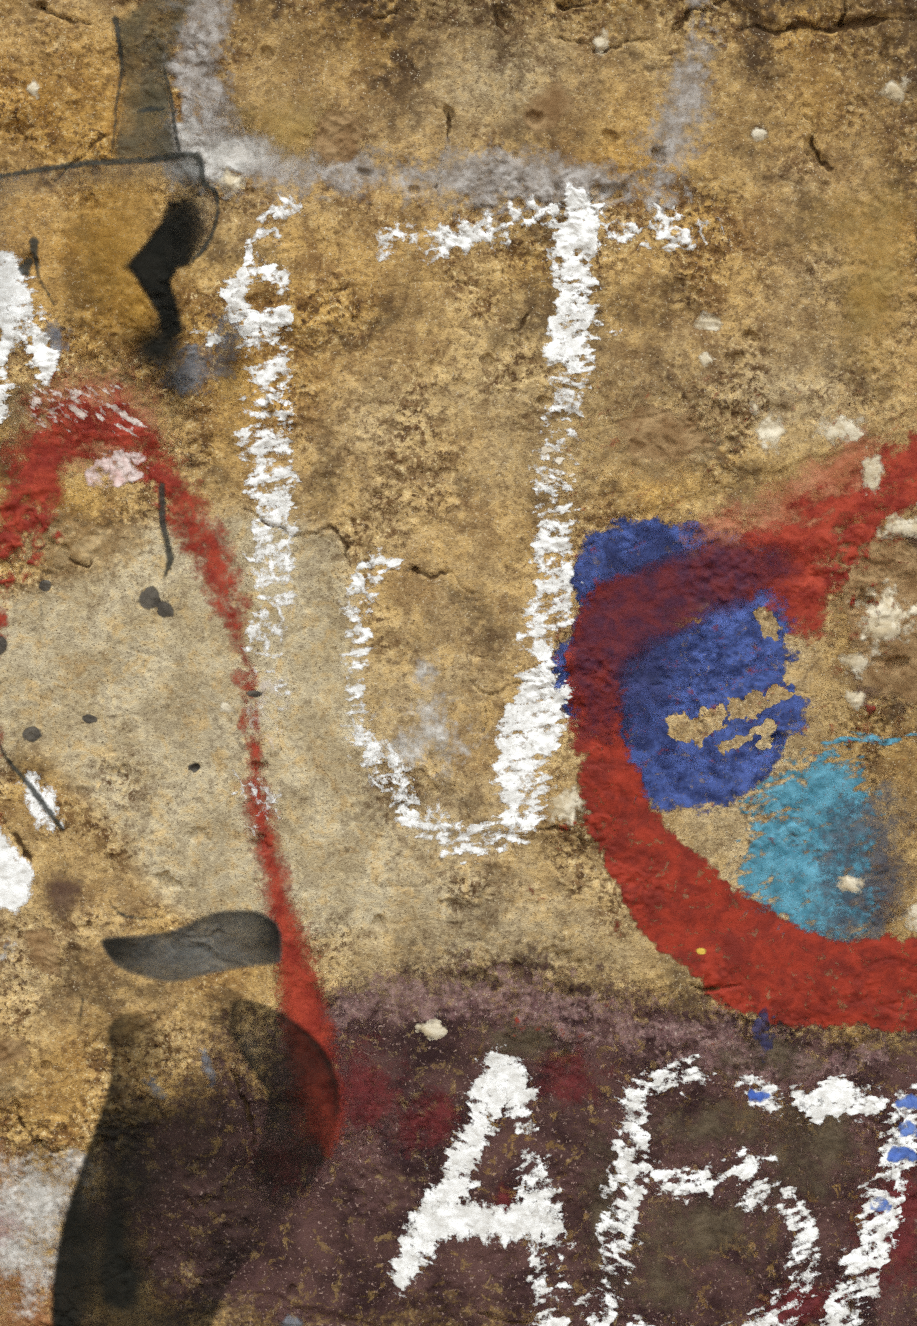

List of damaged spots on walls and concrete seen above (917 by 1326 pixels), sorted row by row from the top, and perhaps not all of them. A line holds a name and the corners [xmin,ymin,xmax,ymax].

crack [496,17,506,33]
crack [558,5,628,53]
crack [679,0,726,28]
crack [754,5,887,36]